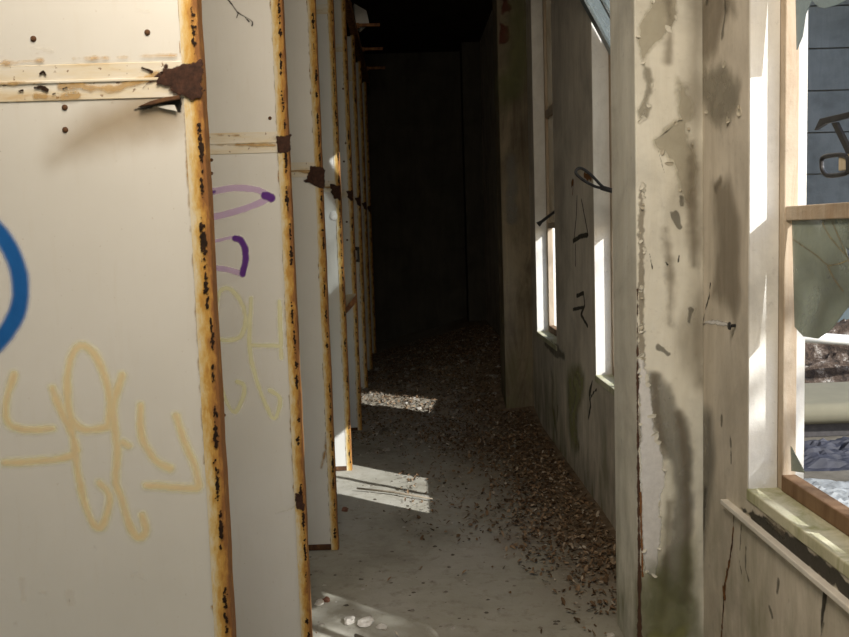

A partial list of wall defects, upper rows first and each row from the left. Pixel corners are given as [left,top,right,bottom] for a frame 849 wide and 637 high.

rust [58,7,205,101]
peeling [636,0,677,124]
peeling [655,88,695,202]
peeling [703,61,741,128]
rust [293,484,307,561]
rust [321,376,334,488]
peeling [637,353,667,578]
water stain [650,374,692,604]
crack [721,517,734,637]